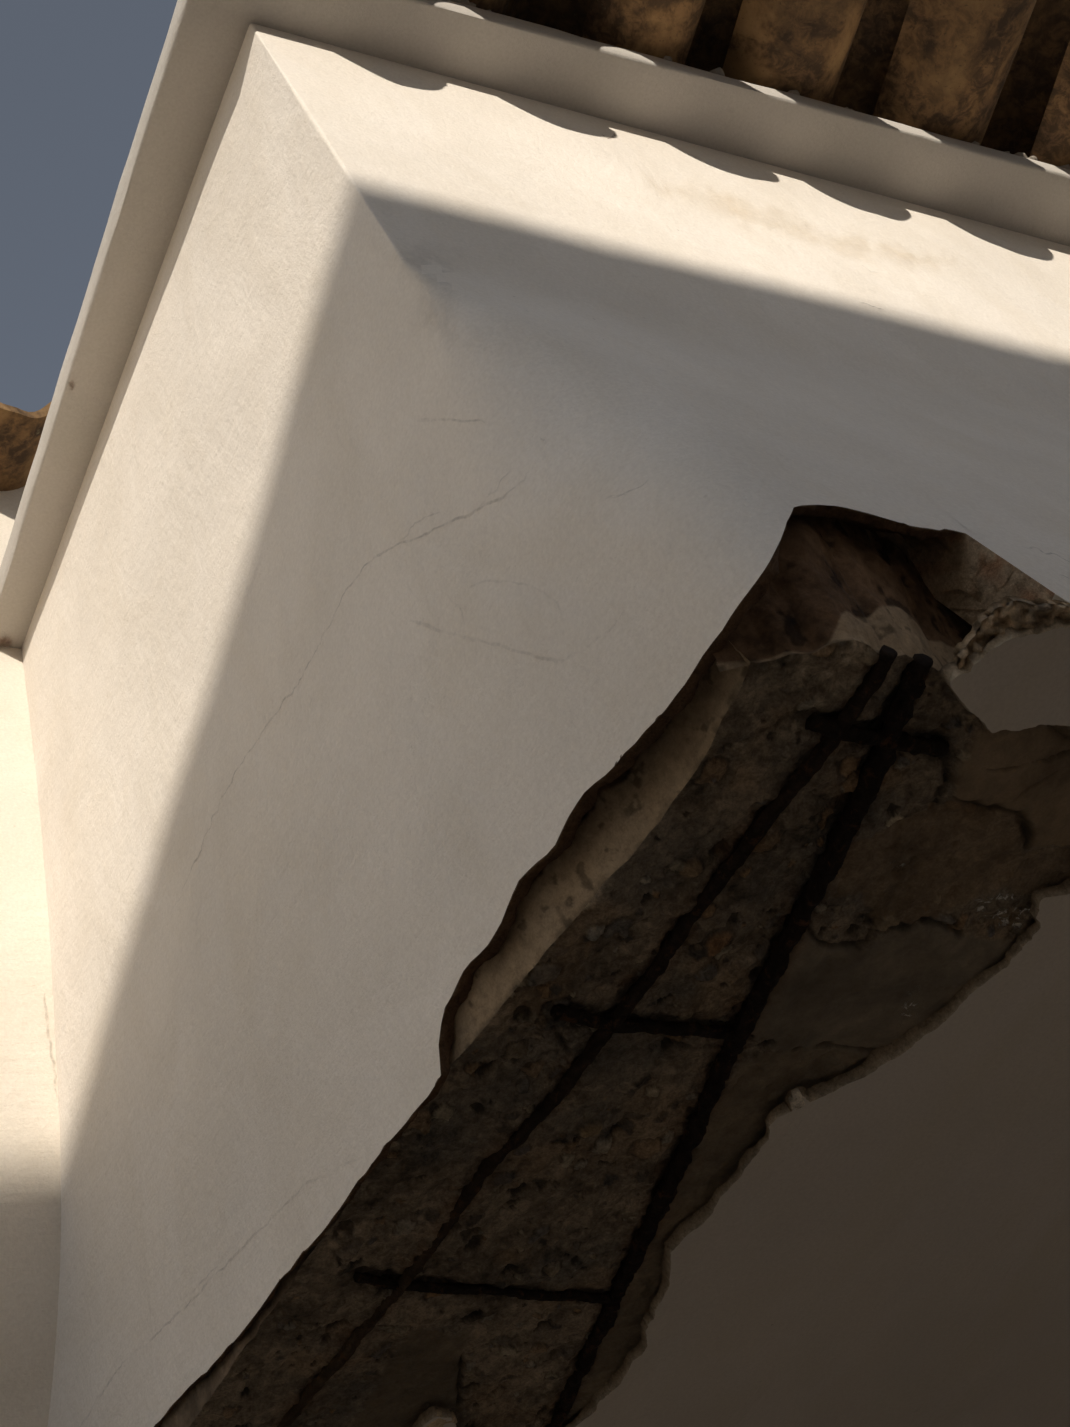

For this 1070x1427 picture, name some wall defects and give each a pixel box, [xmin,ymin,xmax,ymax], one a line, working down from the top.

spalling [154,505,1070,1427]